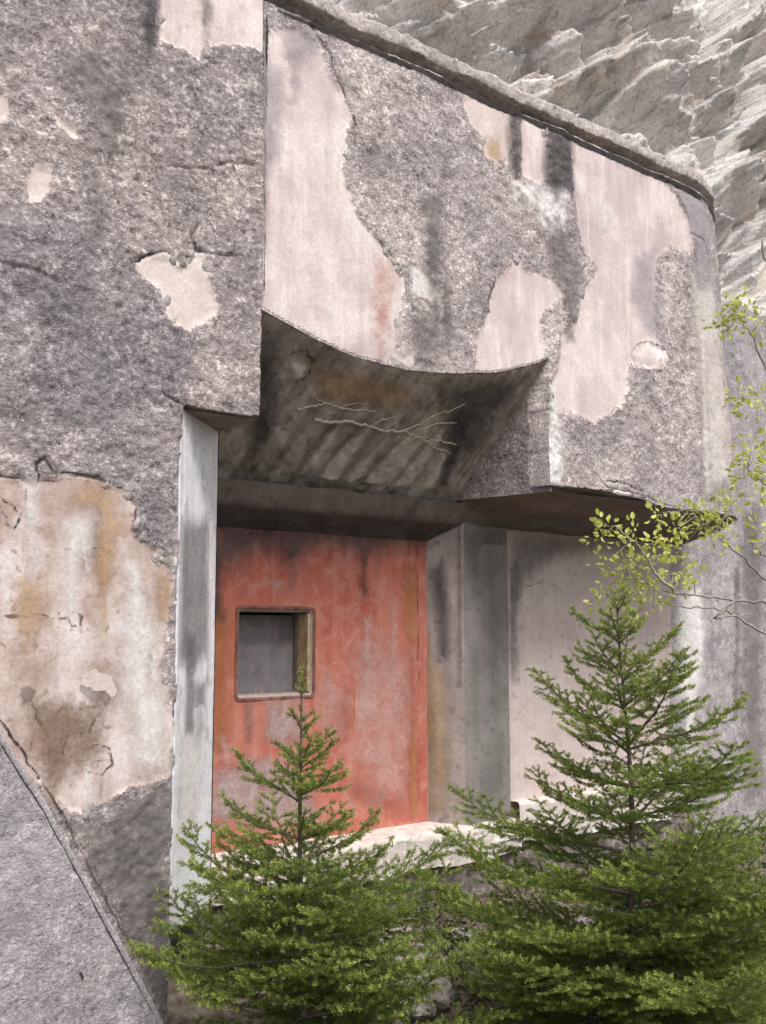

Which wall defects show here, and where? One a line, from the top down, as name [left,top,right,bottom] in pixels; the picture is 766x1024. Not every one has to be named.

spalling [135,249,220,332]
spalling [154,0,433,363]
spalling [461,94,552,186]
leakage [510,116,578,337]
spalling [473,140,695,429]
leakage [65,517,92,611]
spalling [0,475,175,821]
leakage [178,506,453,835]
crack [0,713,160,997]